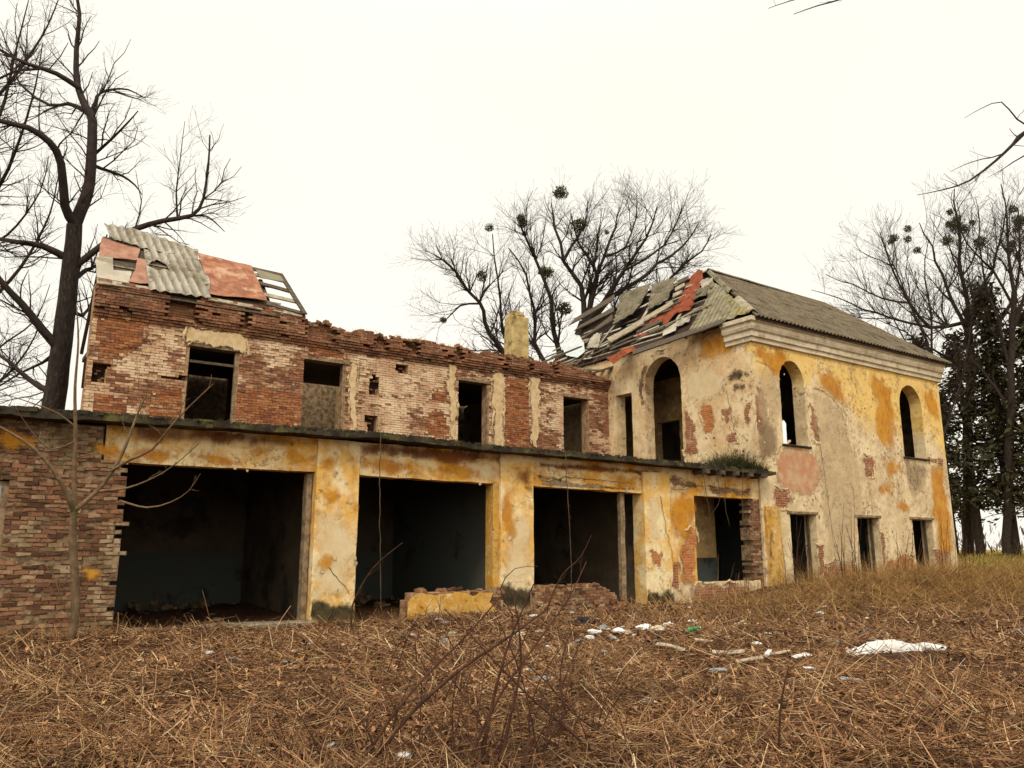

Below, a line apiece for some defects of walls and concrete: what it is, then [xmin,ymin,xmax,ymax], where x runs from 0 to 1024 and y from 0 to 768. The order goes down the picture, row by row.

leakage [143,430,284,444]
flaking render [682,397,739,457]
flaking render [772,403,821,512]
flaking render [863,453,911,511]
flaking render [649,475,753,602]